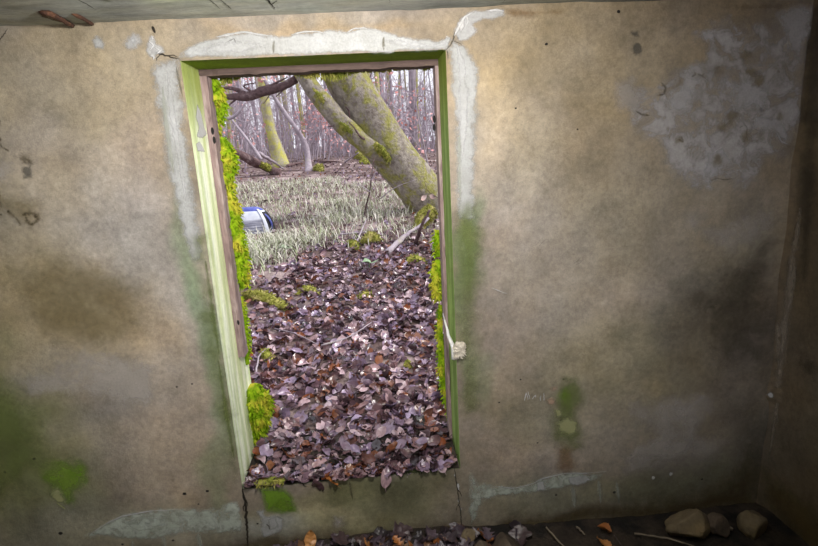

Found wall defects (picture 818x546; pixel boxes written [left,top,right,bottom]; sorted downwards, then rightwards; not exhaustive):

rust [38,10,94,28]
leakage [619,7,818,187]
crack [241,487,249,546]